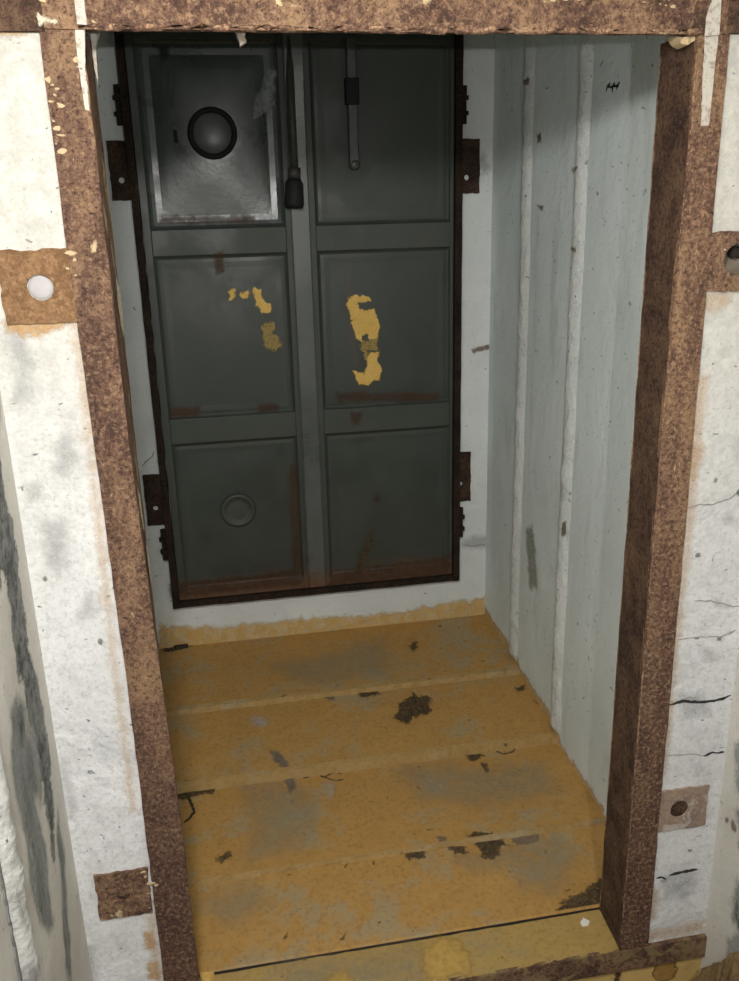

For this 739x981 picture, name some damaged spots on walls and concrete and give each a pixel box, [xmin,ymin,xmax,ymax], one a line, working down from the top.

crack [689,493,737,508]
crack [669,695,731,706]
damp [0,462,71,976]
crack [656,869,698,882]
damp [728,886,739,953]